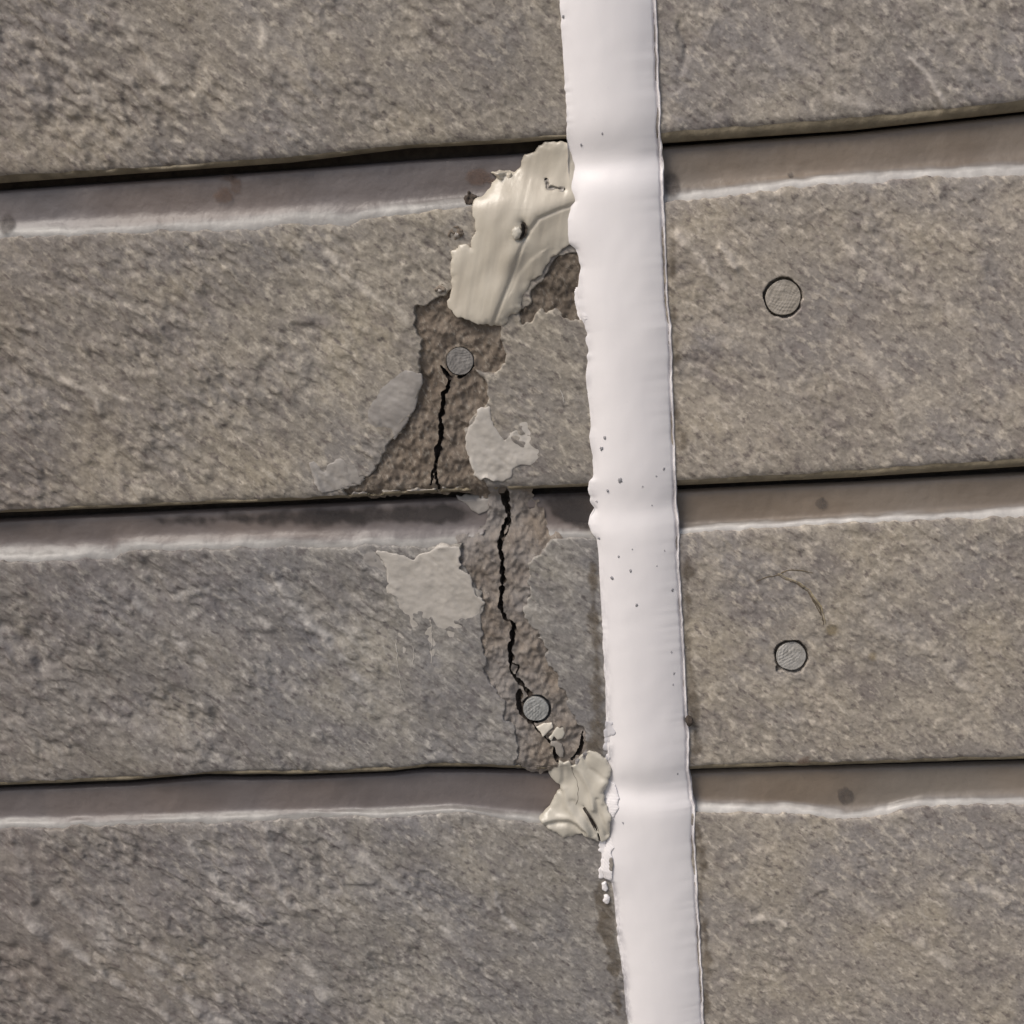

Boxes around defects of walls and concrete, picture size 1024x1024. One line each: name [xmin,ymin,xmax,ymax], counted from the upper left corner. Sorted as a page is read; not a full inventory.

spalling [309,290,587,774]
crack [430,365,475,488]
crack [497,489,601,841]
spalling [520,253,581,325]